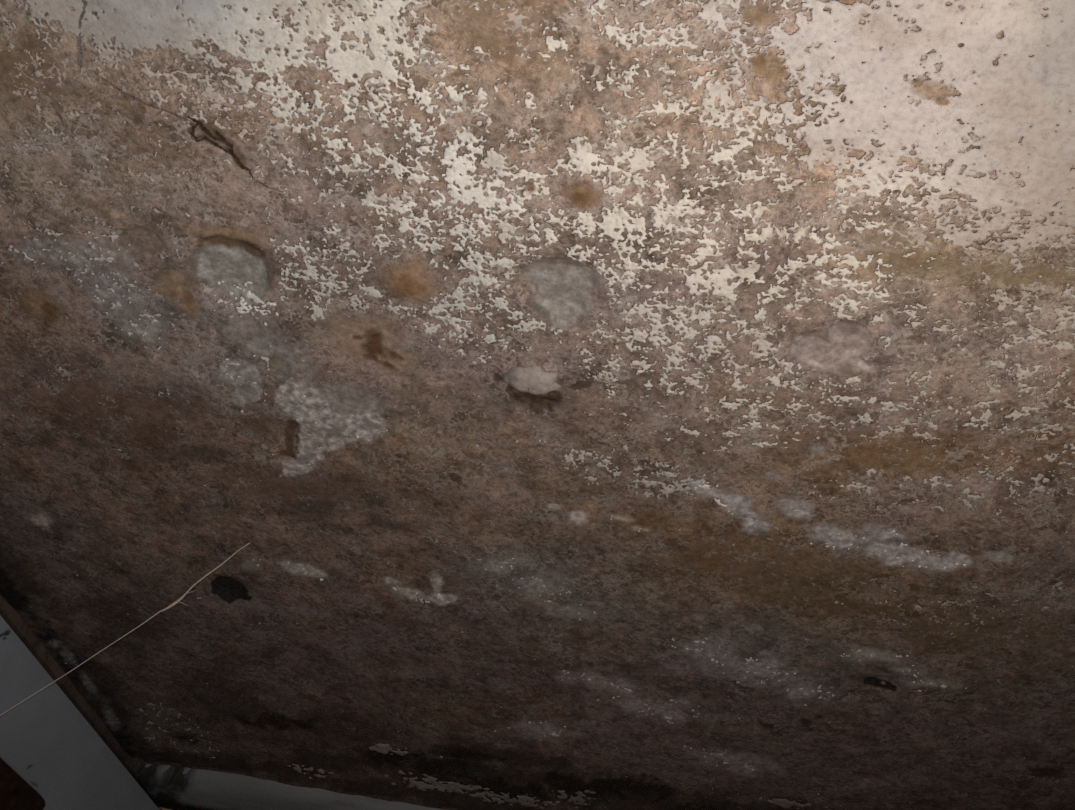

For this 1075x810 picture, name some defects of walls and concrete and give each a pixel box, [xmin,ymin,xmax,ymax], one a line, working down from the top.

crack [79,0,281,192]
efflorescence [1,226,163,358]
peeling [0,0,1075,572]
efflorescence [218,317,388,477]
spalling [212,576,254,603]
efflorescence [281,560,326,581]
efflorescence [385,572,457,605]
efflorescence [688,478,768,532]
efflorescence [778,499,973,571]
peeling [845,486,1075,675]
leakage [38,632,699,810]
spalling [864,677,897,691]